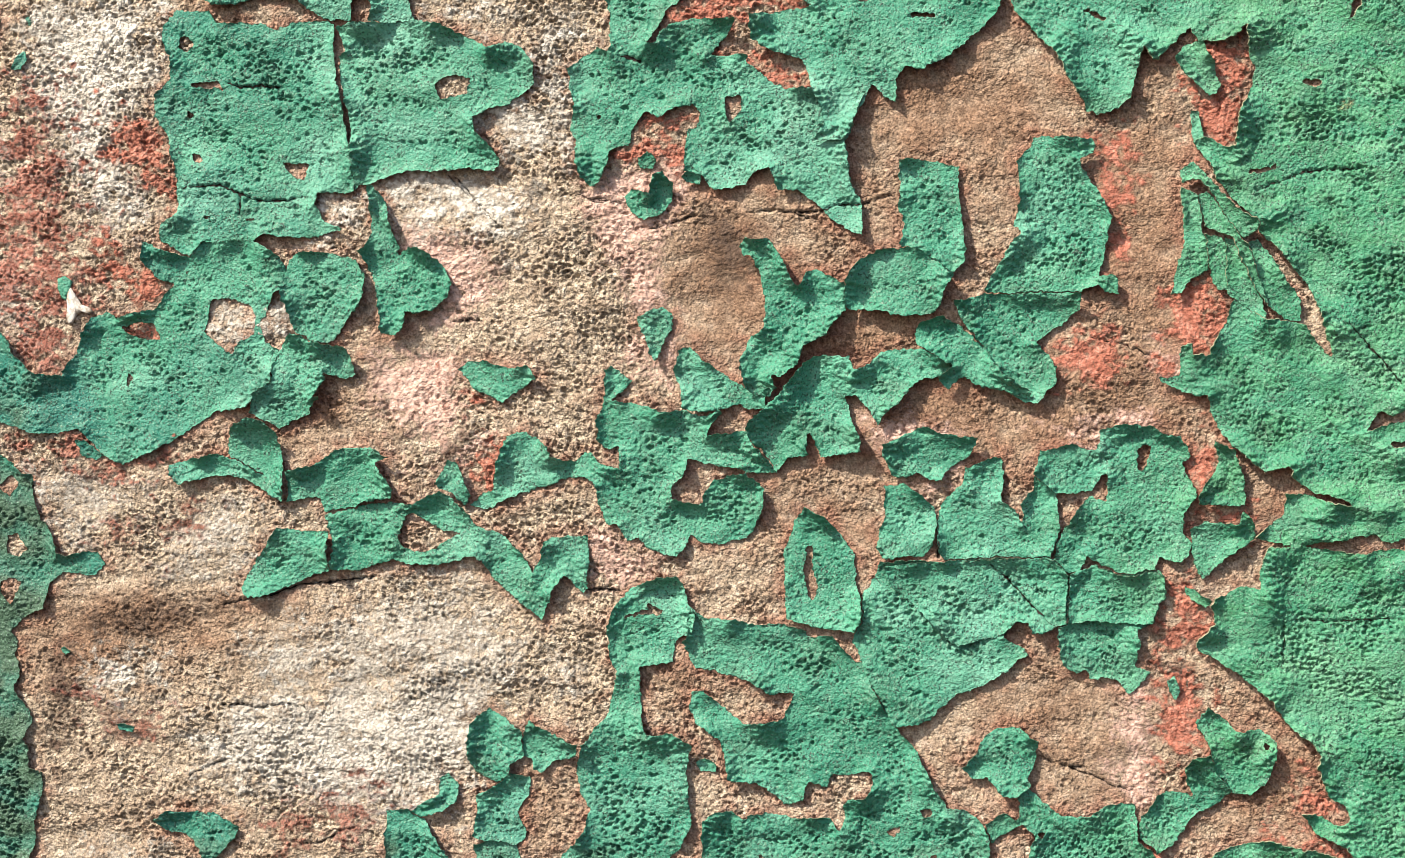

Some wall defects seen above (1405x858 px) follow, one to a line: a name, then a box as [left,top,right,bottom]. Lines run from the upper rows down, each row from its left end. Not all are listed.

crack [751,195,900,219]
peeling [0,0,846,858]
peeling [473,0,1351,858]
peeling [1367,411,1405,431]
peeling [1301,535,1405,554]